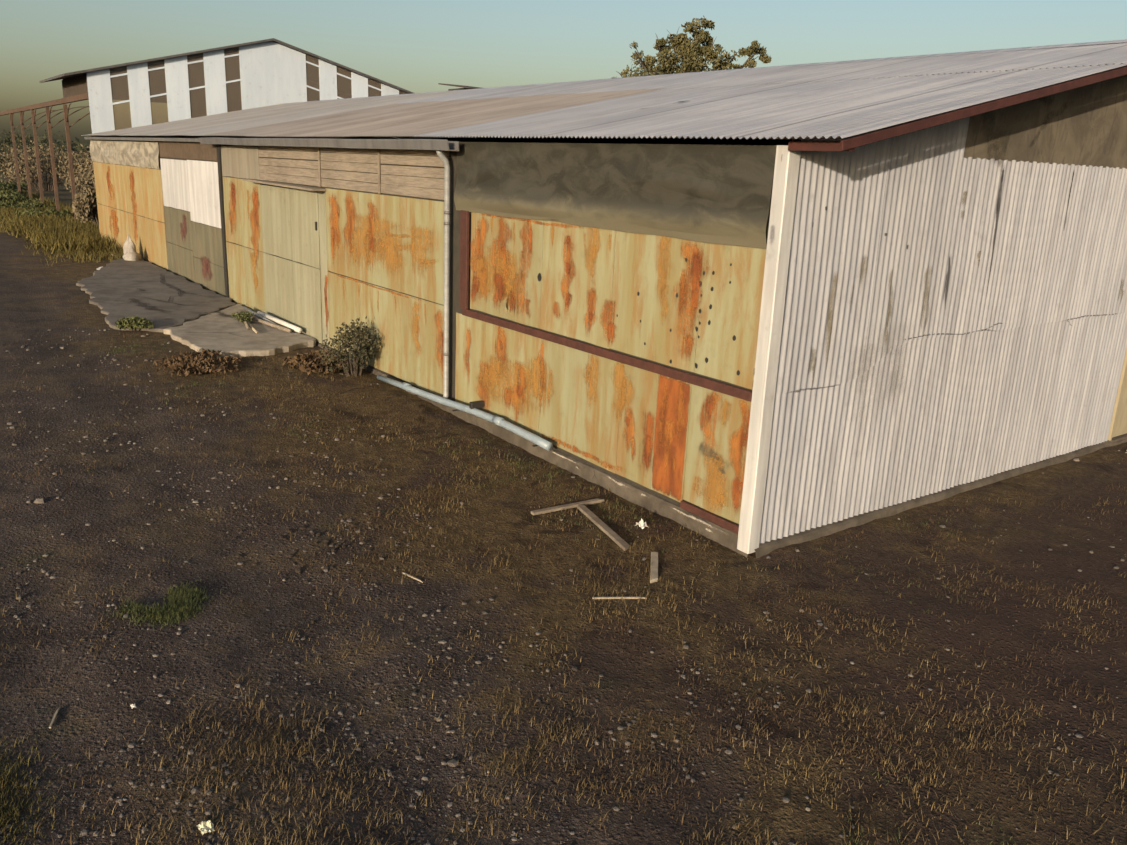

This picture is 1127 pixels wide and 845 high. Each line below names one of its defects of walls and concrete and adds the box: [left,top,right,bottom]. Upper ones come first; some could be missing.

corrosion [107,166,118,236]
corrosion [129,173,137,241]
corrosion [229,184,259,287]
corrosion [324,276,403,327]
corrosion [658,237,708,355]
corrosion [413,304,444,371]
corrosion [543,435,613,469]
corrosion [614,363,750,509]